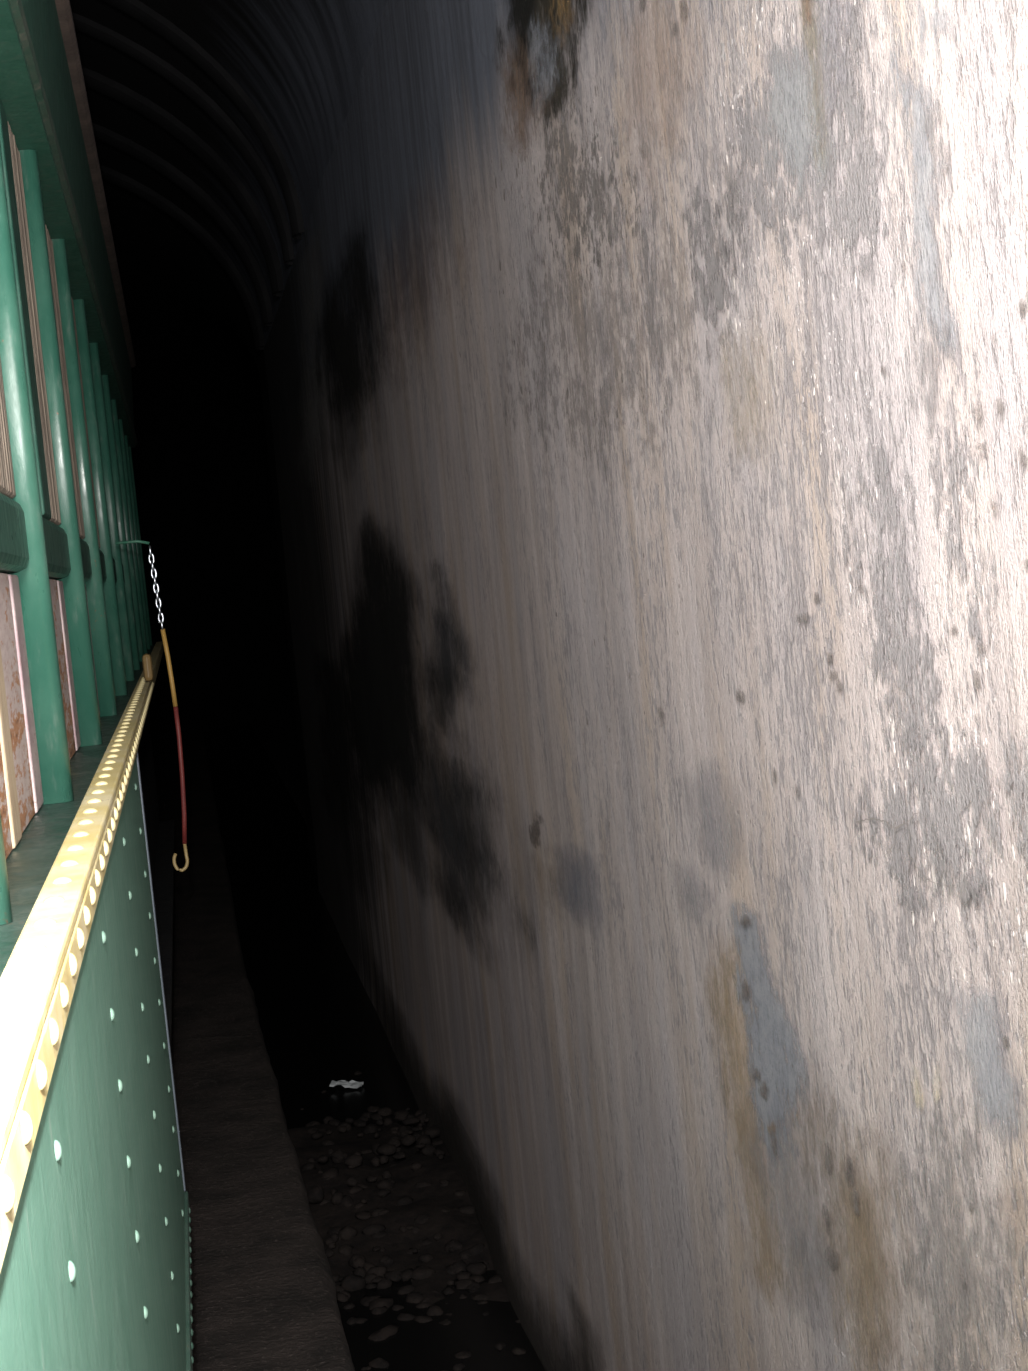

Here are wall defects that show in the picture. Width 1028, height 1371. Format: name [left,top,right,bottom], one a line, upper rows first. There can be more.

leakage [498,0,591,142]
leakage [319,518,491,918]